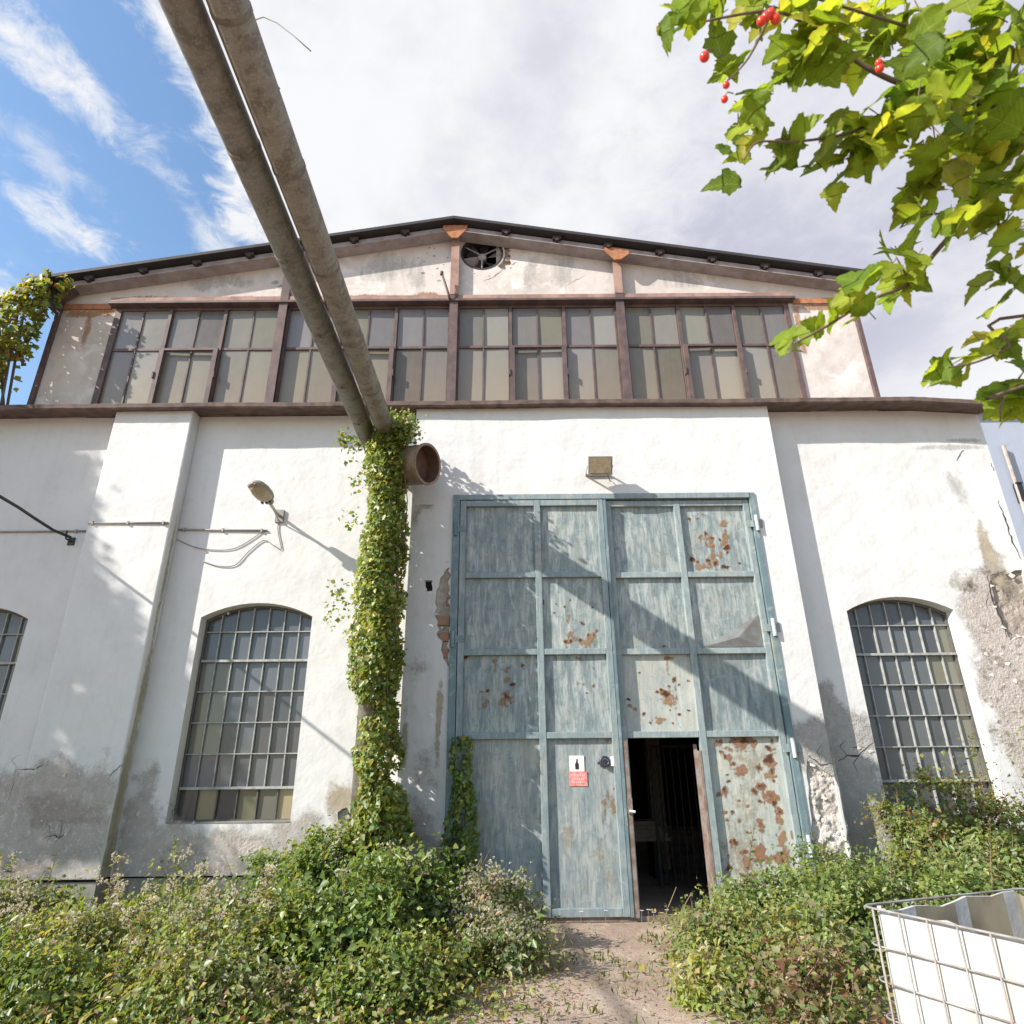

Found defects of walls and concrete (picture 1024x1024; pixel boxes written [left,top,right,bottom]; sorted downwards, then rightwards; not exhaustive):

spalling [426,560,451,667]
rust [480,659,516,708]
rust [543,599,598,662]
rust [626,645,690,724]
rust [689,520,741,571]
peeling [961,570,1024,774]
crack [986,500,1020,637]
water stain [0,761,351,880]
rust [714,737,793,886]
crack [809,741,874,770]
peeling [793,682,896,880]